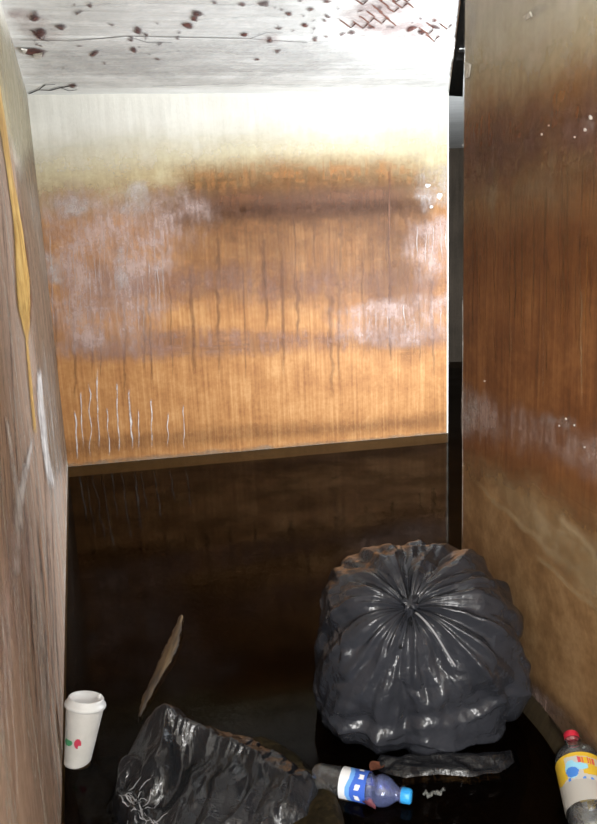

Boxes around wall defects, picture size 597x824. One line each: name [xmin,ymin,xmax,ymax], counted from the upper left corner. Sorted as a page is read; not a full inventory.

damp [0,37,447,824]
damp [462,27,597,756]